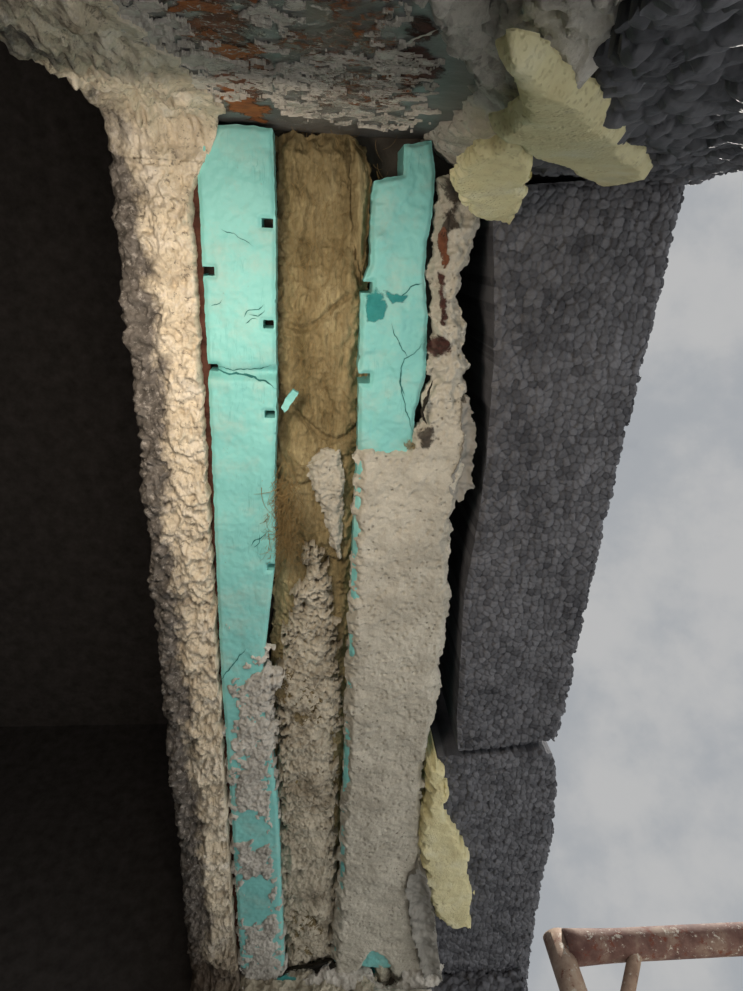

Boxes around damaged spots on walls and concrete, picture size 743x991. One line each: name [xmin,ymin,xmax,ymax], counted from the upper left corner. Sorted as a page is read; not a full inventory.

peeling [100,0,445,132]
rust [165,0,445,123]
crack [276,957,337,981]